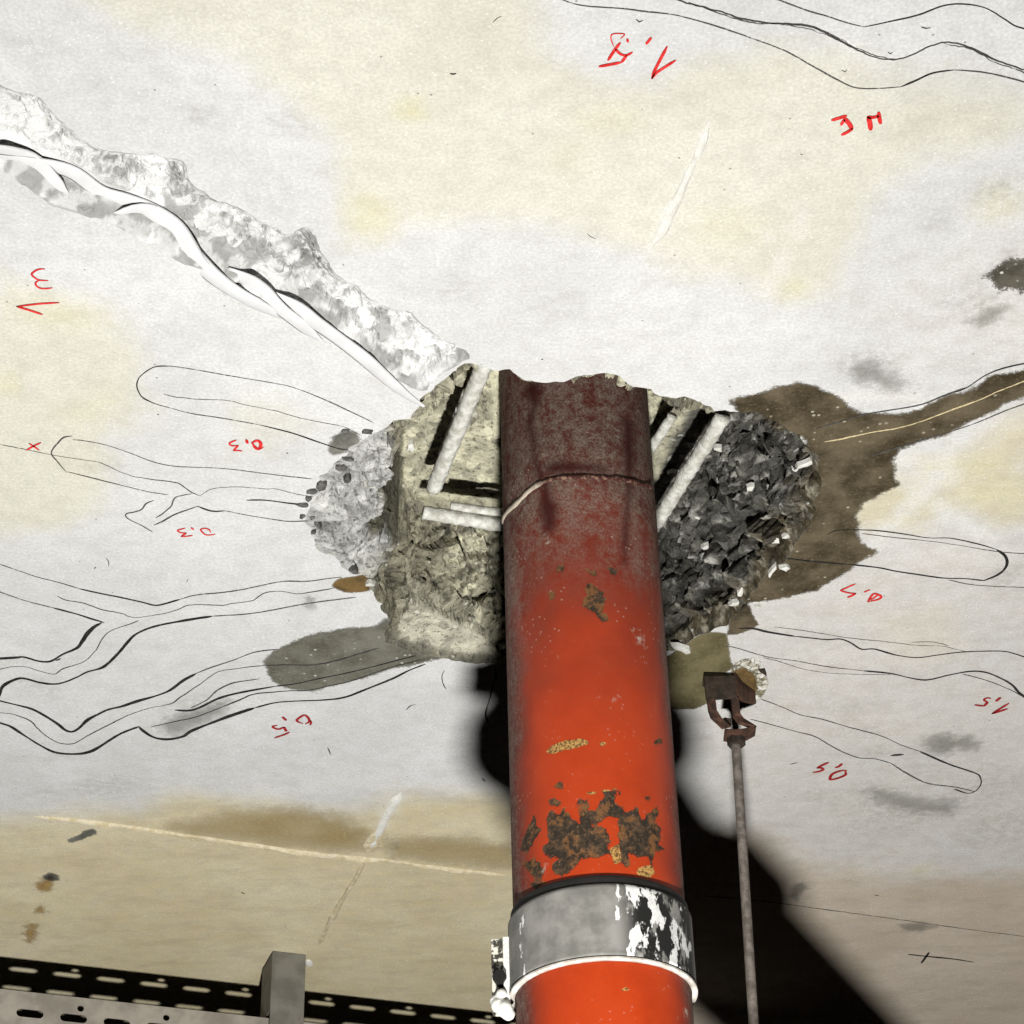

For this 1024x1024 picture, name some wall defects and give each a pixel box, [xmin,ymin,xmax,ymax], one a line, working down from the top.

spalling [0,85,507,665]
spalling [571,373,634,391]
spalling [647,389,822,654]
water stain [667,371,1024,710]
rust [332,575,370,593]
water stain [264,618,440,691]
water stain [189,813,360,846]
water stain [394,842,510,864]